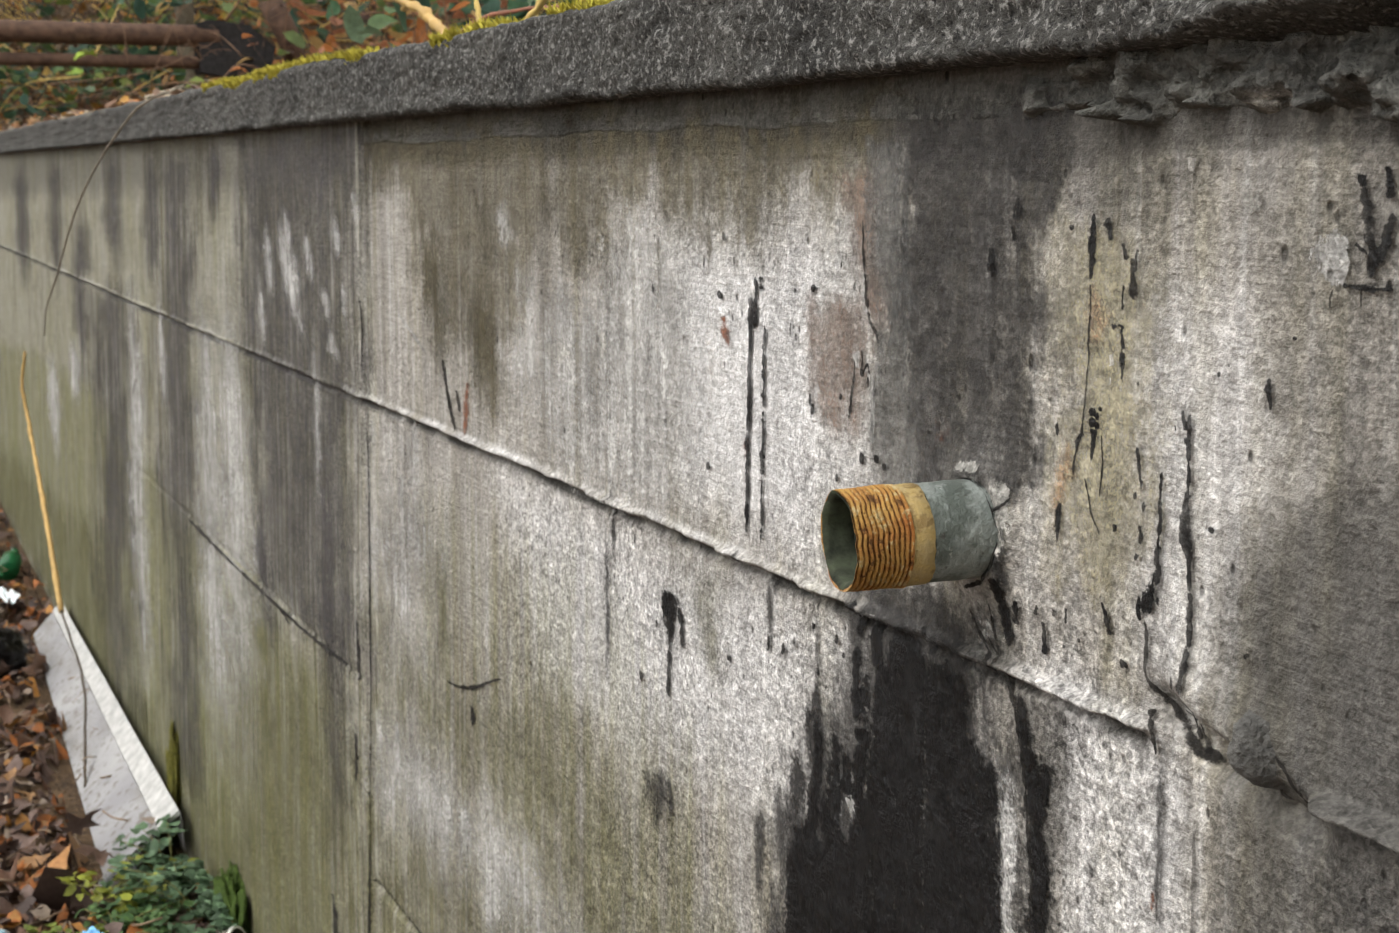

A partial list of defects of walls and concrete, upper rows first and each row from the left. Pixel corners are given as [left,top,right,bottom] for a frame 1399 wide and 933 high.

leakage [13,122,542,933]
leakage [744,276,766,543]
leakage [794,80,1193,695]
leakage [754,531,1080,933]
leakage [1154,771,1163,920]
crack [1143,620,1238,773]
crack [1274,756,1308,803]